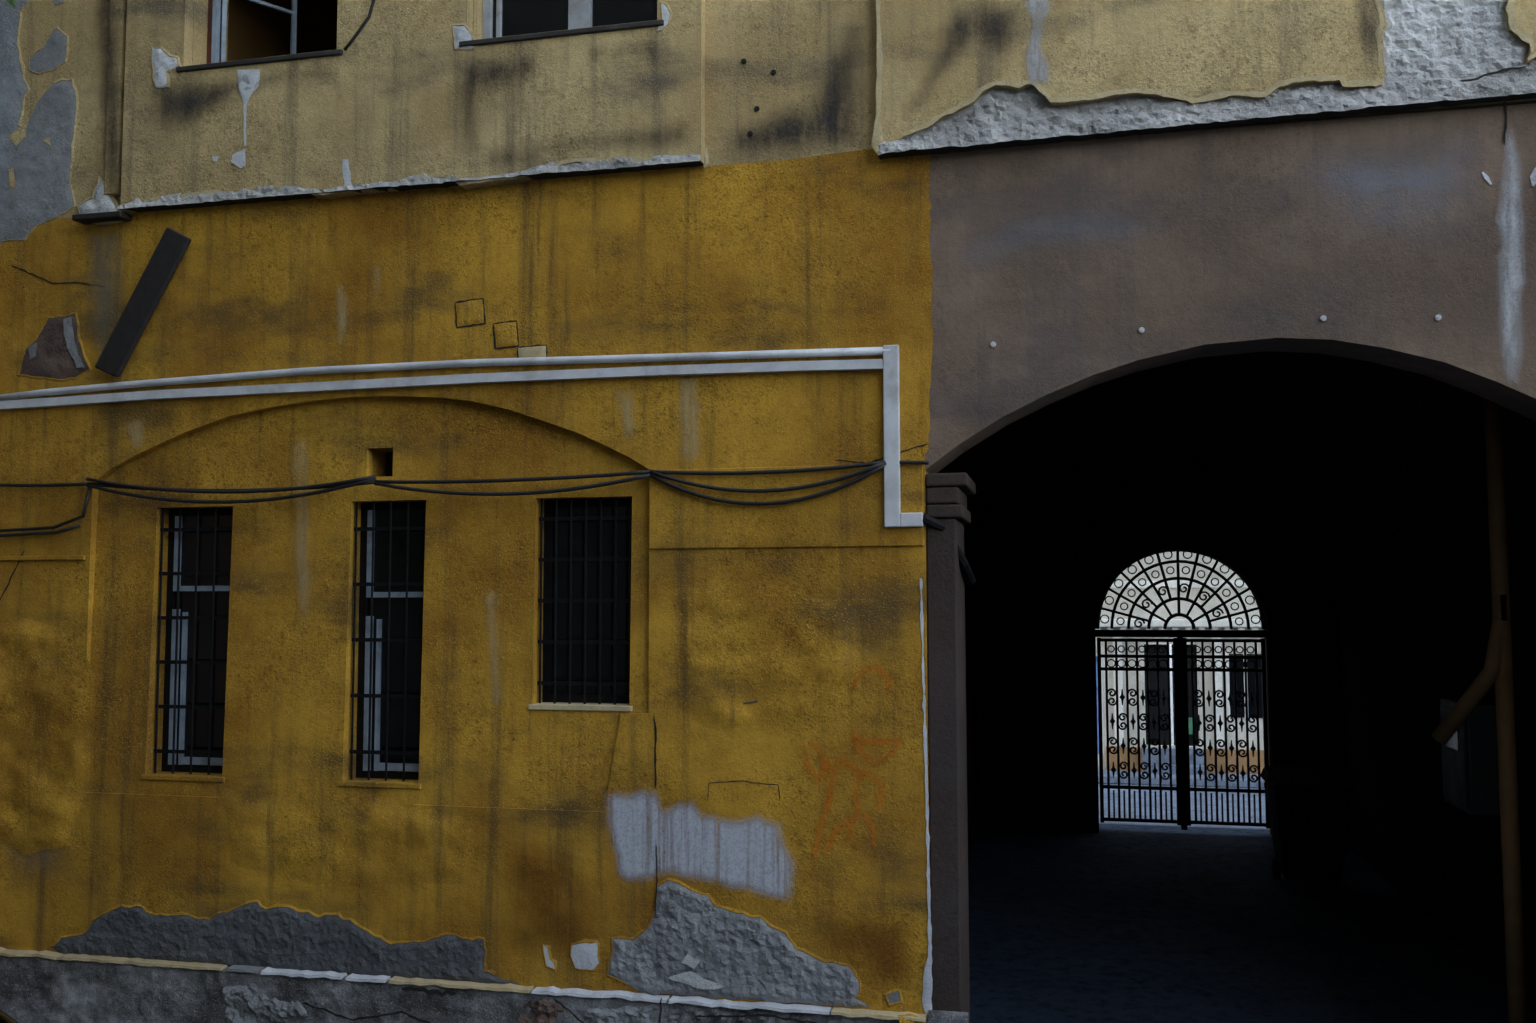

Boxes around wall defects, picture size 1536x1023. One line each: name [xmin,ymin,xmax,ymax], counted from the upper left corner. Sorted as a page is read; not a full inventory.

flaking render [0,0,709,245]
leakage [740,57,850,145]
leakage [949,13,1009,54]
leakage [1027,0,1068,81]
spalling [871,0,1536,159]
leakage [1500,101,1522,368]
flaking render [542,578,933,1023]
flaking render [50,899,519,1023]